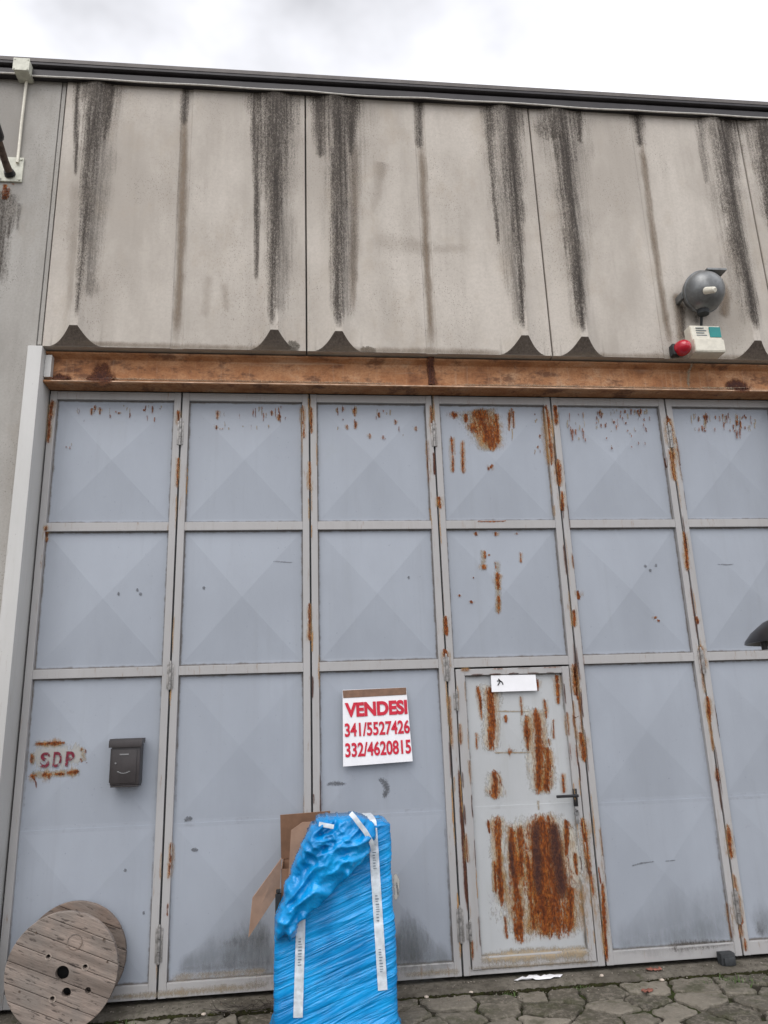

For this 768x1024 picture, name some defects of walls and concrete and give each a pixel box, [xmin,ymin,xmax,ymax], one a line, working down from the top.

water stain [250,91,361,352]
water stain [483,104,543,355]
water stain [538,107,604,356]
water stain [714,118,768,325]
water stain [50,325,119,347]
corrosion [427,357,437,423]
corrosion [450,437,464,472]
corrosion [451,408,514,451]
corrosion [534,405,650,524]
water stain [729,340,768,360]
corrosion [446,646,608,970]
corrosion [706,695,722,809]